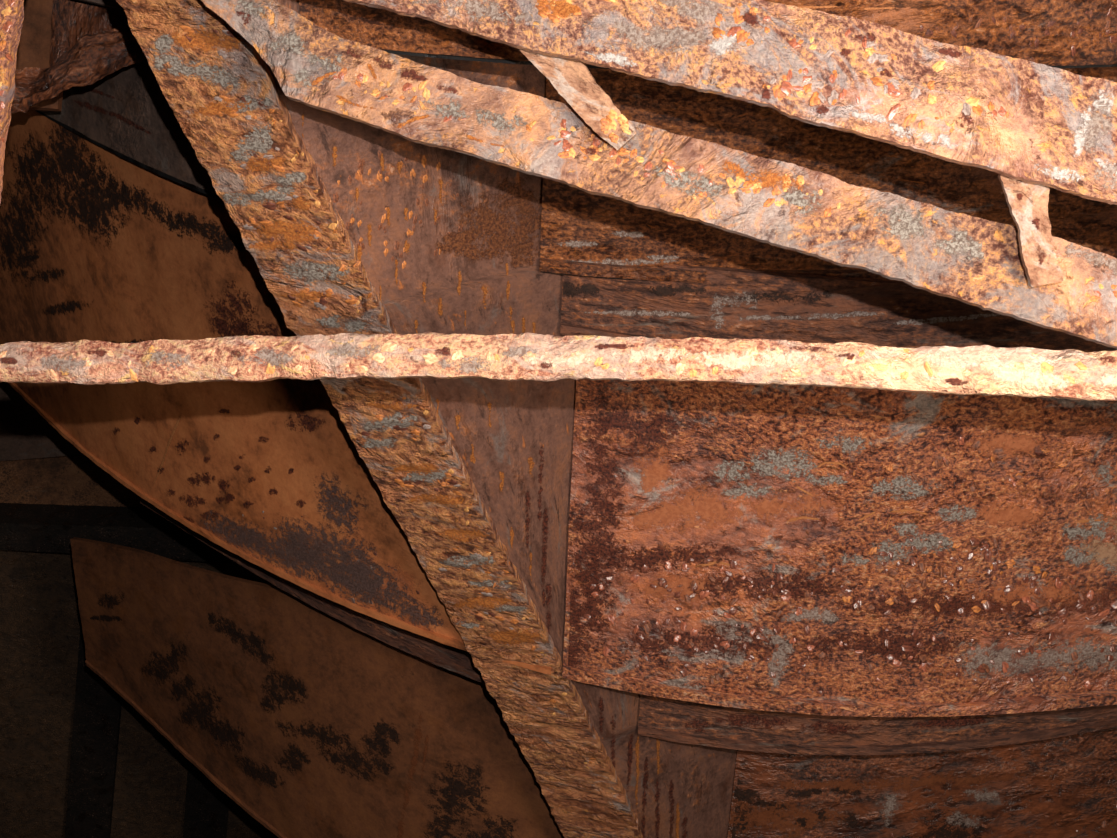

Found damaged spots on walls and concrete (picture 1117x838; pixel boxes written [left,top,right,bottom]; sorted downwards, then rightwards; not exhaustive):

rust [312,64,466,128]
rust [712,3,771,47]
rust [762,37,860,106]
rust [845,29,946,129]
rust [244,150,542,334]
damp [206,281,280,337]
rust [346,342,467,374]
damp [286,411,325,433]
damp [198,475,444,630]
rust [510,446,552,633]
damp [141,613,401,788]
rust [598,697,687,838]